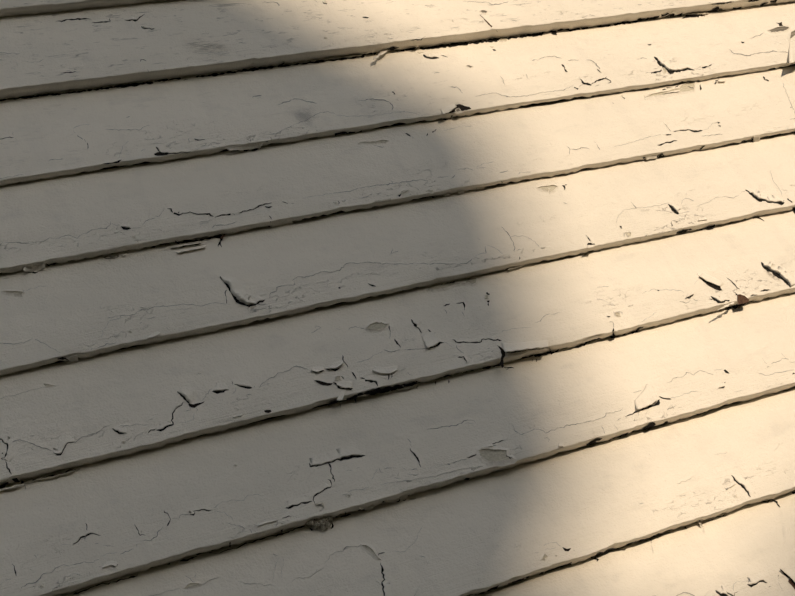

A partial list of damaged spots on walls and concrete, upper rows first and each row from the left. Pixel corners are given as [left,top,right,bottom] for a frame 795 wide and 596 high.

peeling [766,22,795,65]
crack [0,162,525,250]
peeling [696,273,724,291]
peeling [717,285,770,311]
peeling [761,262,795,287]
peeling [487,340,551,370]
crack [0,363,309,474]
peeling [618,384,671,420]
crack [286,439,466,509]
crack [725,474,756,497]
crack [380,562,392,596]
crack [716,573,771,596]